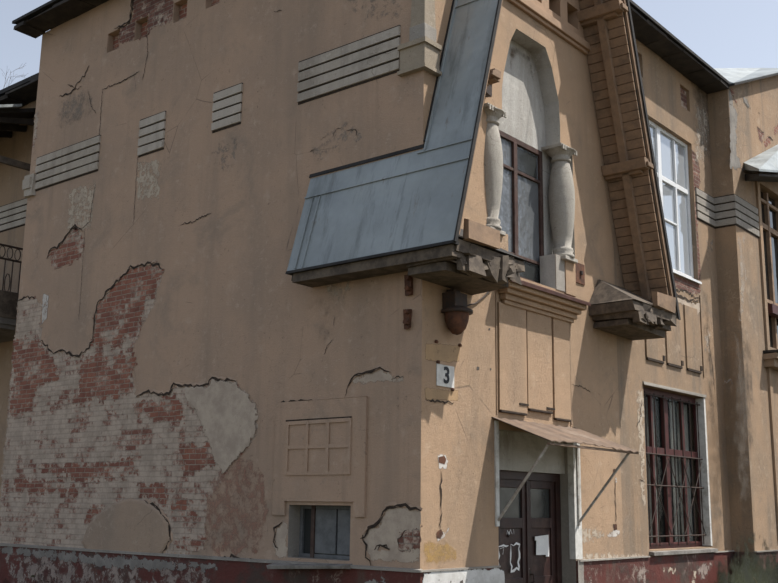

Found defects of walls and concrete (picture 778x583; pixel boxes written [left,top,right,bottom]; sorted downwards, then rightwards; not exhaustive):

flaking render [114,0,174,44]
crack [60,39,148,135]
flaking render [46,183,96,269]
flaking render [346,365,403,387]
flaking render [0,259,268,583]
flaking render [273,519,288,558]
flaking render [360,501,423,566]
peeling [579,553,646,583]
peeling [692,562,711,583]